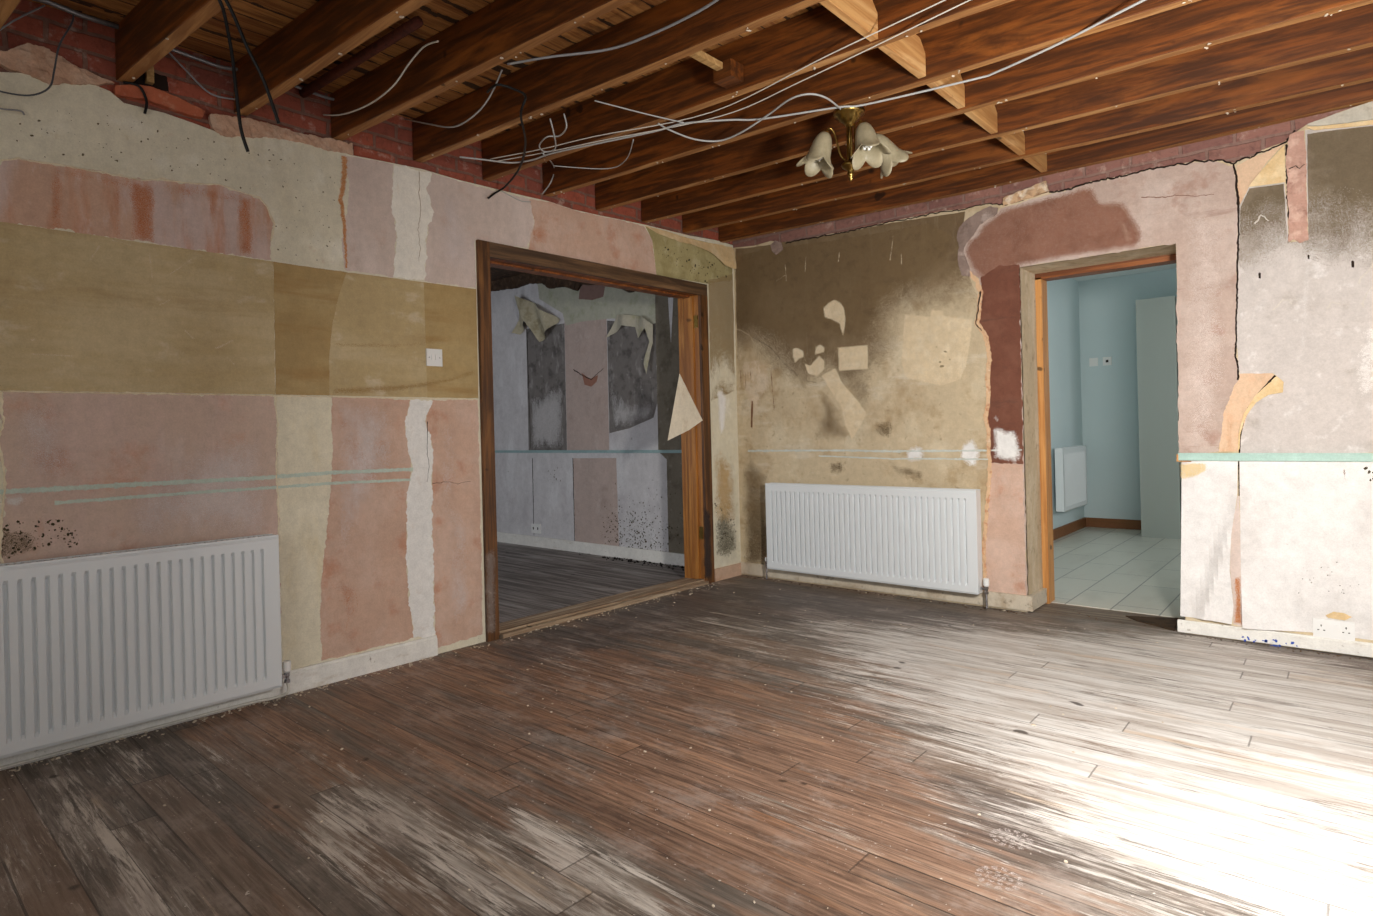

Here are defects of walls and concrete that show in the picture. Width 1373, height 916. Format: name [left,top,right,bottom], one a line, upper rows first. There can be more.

water stain [1,519,78,559]
flaking render [0,43,397,278]
flaking render [0,390,483,661]
water stain [526,323,567,450]
flaking render [425,173,736,374]
water stain [600,295,684,554]
water stain [646,227,753,427]
crack [786,130,1296,496]
flaking render [957,120,1373,595]